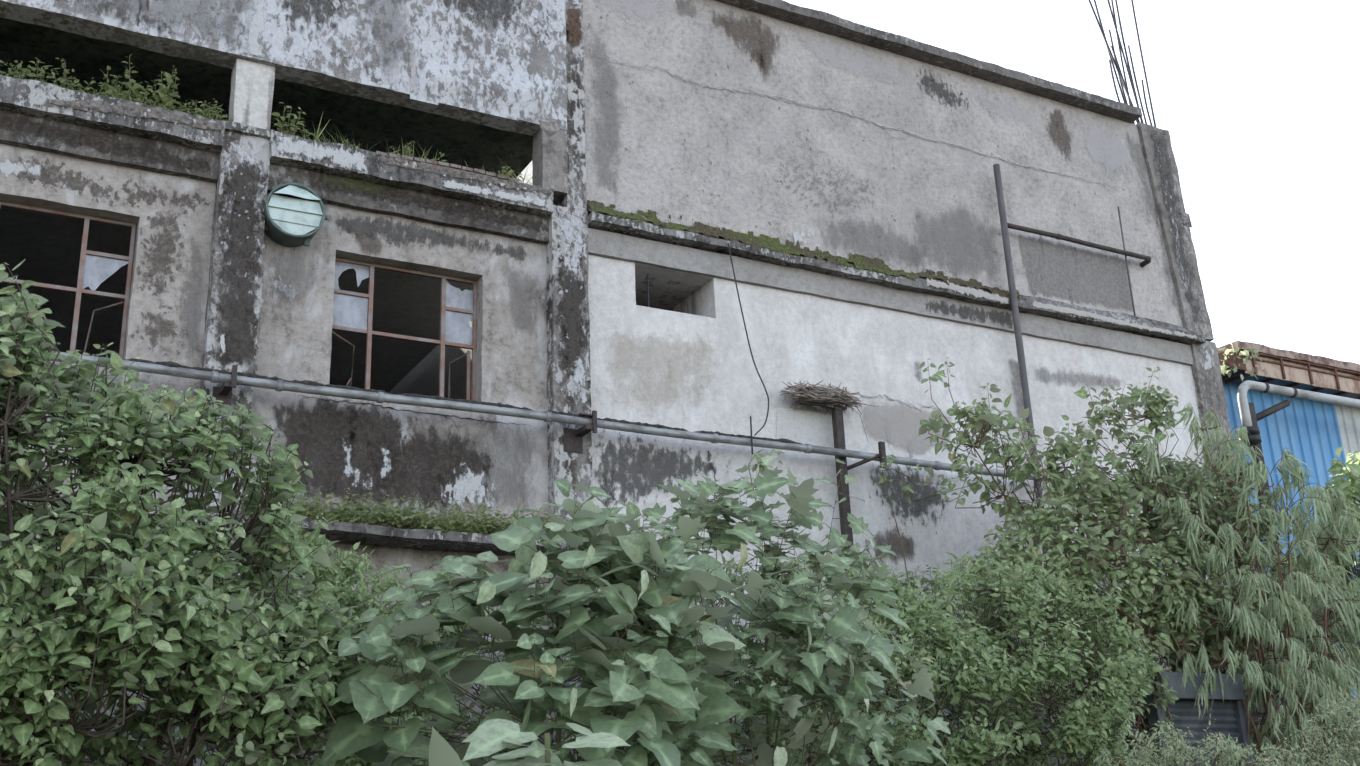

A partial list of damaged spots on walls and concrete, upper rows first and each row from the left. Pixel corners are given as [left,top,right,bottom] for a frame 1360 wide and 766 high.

spalling [51,99,225,130]
damp [713,12,778,74]
crack [590,49,1130,189]
damp [916,69,969,112]
peeling [11,144,302,355]
peeling [555,207,591,403]
damp [926,300,1013,328]
damp [1050,110,1203,322]
damp [274,398,530,513]
damp [595,431,730,506]